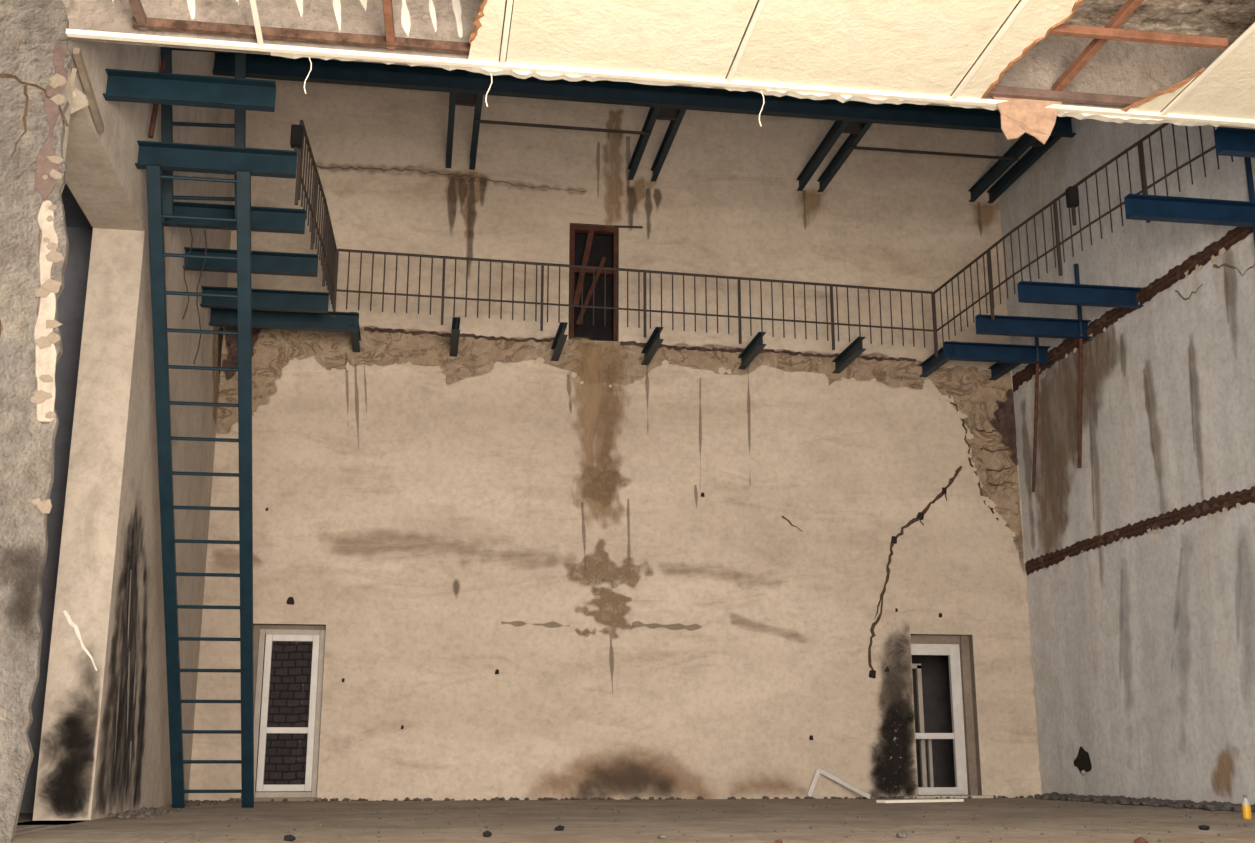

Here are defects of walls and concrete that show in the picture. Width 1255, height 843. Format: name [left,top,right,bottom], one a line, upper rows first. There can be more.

flaking render [270,52,998,111]
flaking render [1057,112,1255,128]
flaking render [30,44,105,424]
rust [1012,226,1255,575]
flaking render [212,326,1024,561]
flaking render [31,498,52,514]
crack [868,466,962,679]
leakage [548,757,706,798]
spalling [1074,746,1092,775]